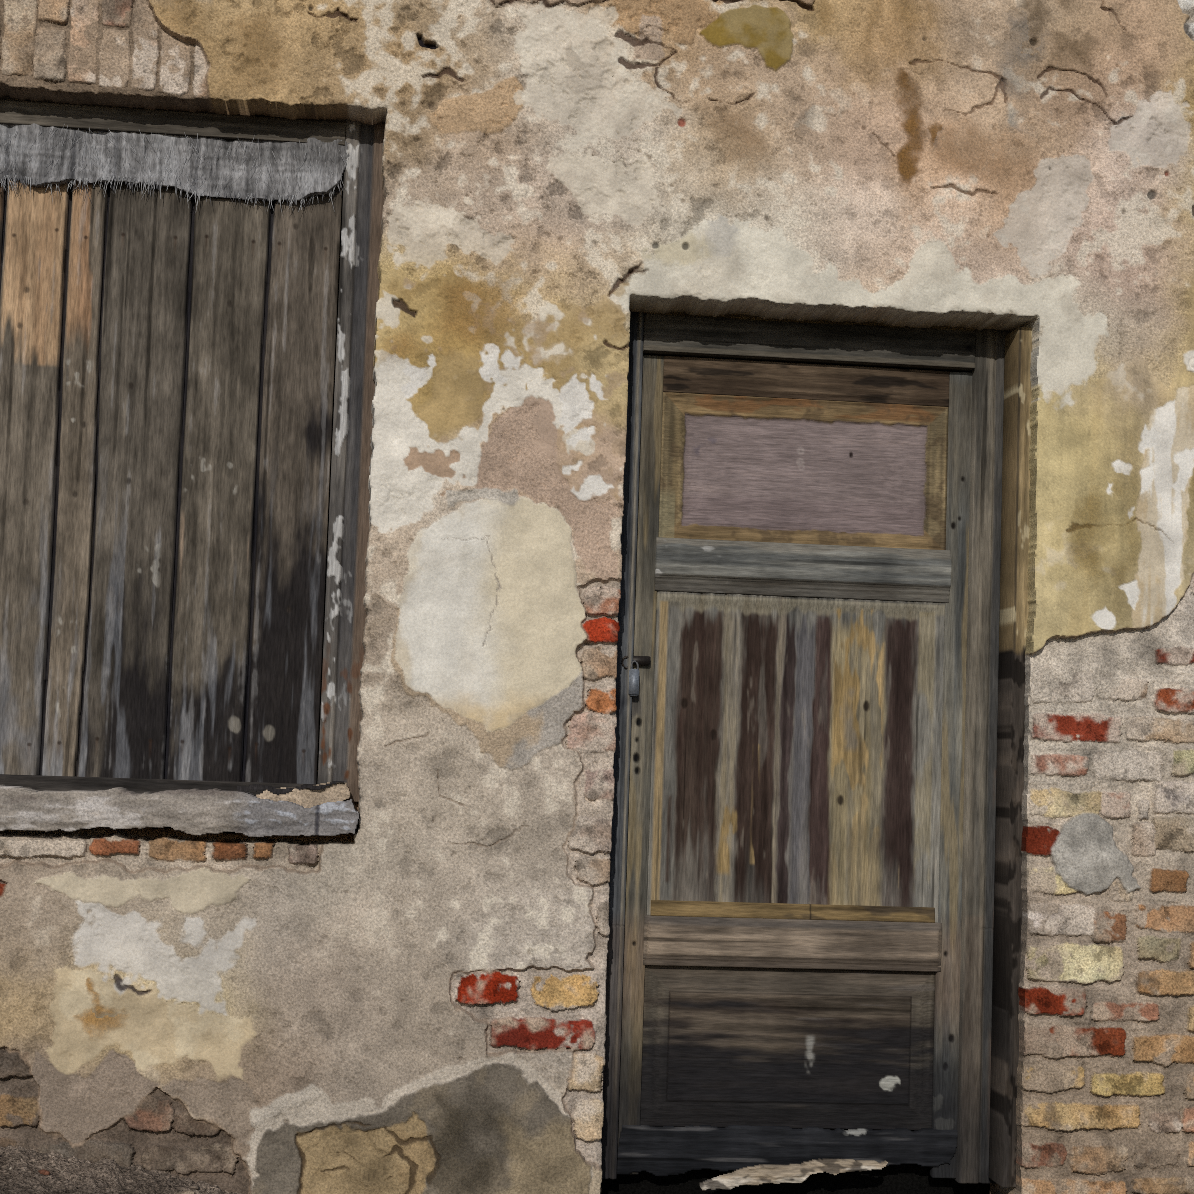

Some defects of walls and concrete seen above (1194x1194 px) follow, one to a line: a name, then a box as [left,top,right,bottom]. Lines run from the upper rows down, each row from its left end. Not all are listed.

crack [490,0,611,10]
crack [711,0,816,12]
spalling [0,0,215,113]
crack [422,67,465,82]
peeling [514,0,795,226]
crack [615,29,755,106]
crack [909,59,1009,118]
crack [1037,66,1135,126]
spalling [369,154,1194,1194]
peeling [0,834,325,1081]
spalling [0,1045,254,1194]
spalling [297,1112,436,1194]